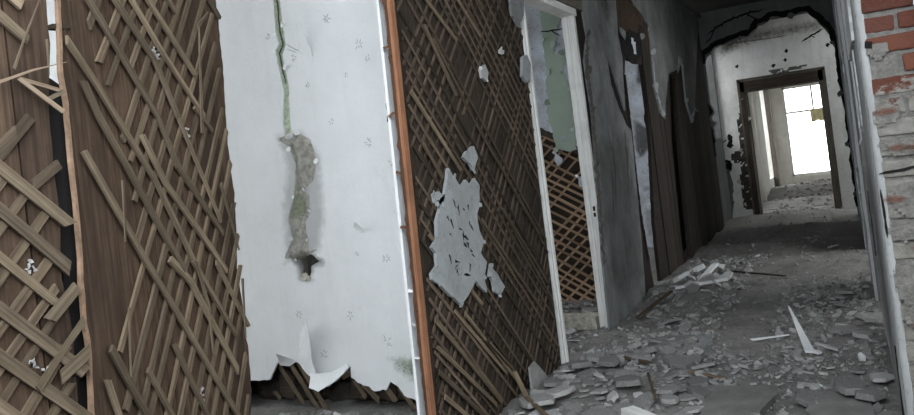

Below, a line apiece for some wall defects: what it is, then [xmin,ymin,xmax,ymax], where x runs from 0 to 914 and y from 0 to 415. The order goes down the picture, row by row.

crack [266,0,310,141]
flaking render [478,64,489,82]
flaking render [508,0,524,28]
flaking render [520,55,531,83]
peeling [540,10,578,166]
flaking render [251,0,428,415]
flaking render [429,146,505,308]
flaking render [702,0,914,413]